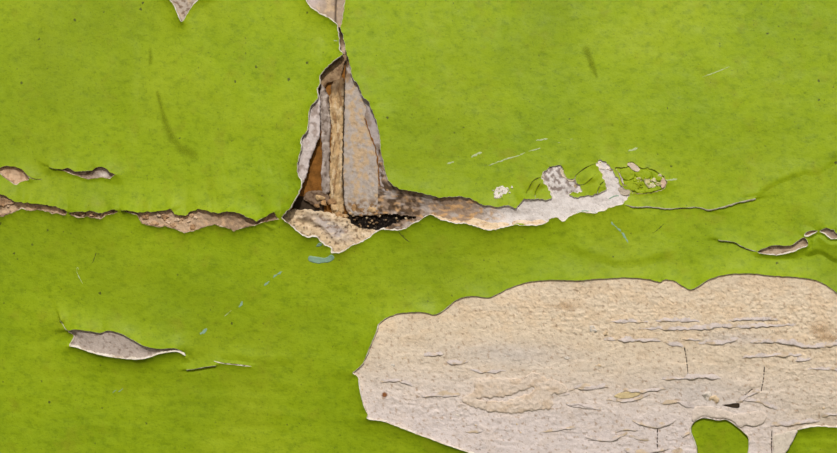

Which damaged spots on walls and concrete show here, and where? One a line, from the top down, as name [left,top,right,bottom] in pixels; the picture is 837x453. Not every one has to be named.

peeling [170,0,198,22]
peeling [306,0,345,27]
flaking render [282,54,756,264]
peeling [0,166,41,185]
peeling [50,167,116,179]
peeling [820,228,837,239]
peeling [60,321,186,360]
peeling [353,273,837,453]